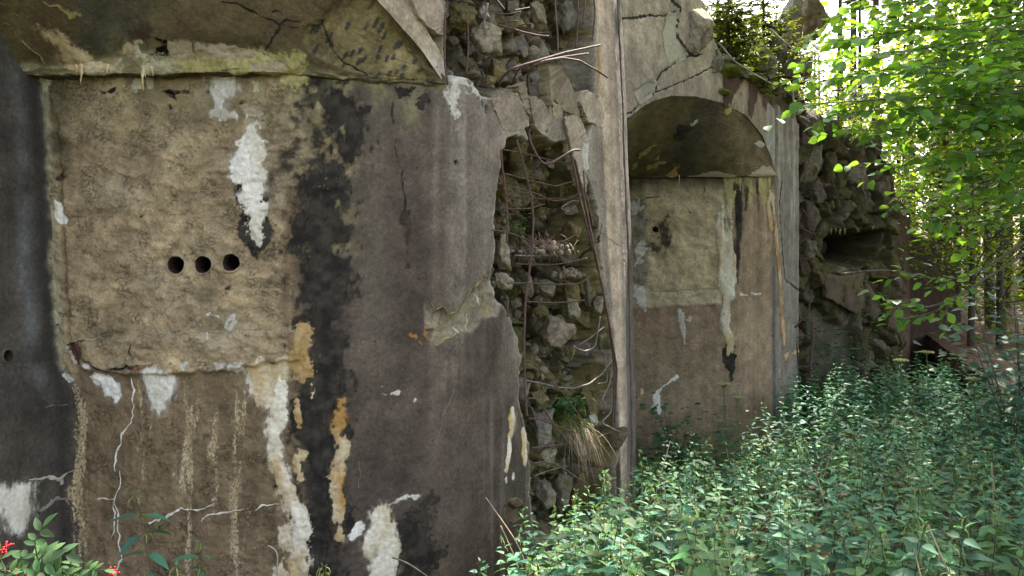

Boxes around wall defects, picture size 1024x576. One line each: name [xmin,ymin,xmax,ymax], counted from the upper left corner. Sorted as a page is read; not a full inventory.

crack [221,1,368,76]
crack [622,0,712,120]
water stain [34,24,448,576]
water stain [630,144,777,381]
efflorescence [0,482,36,534]
crack [29,470,75,512]
crack [74,298,294,576]
corrosion [326,397,351,542]